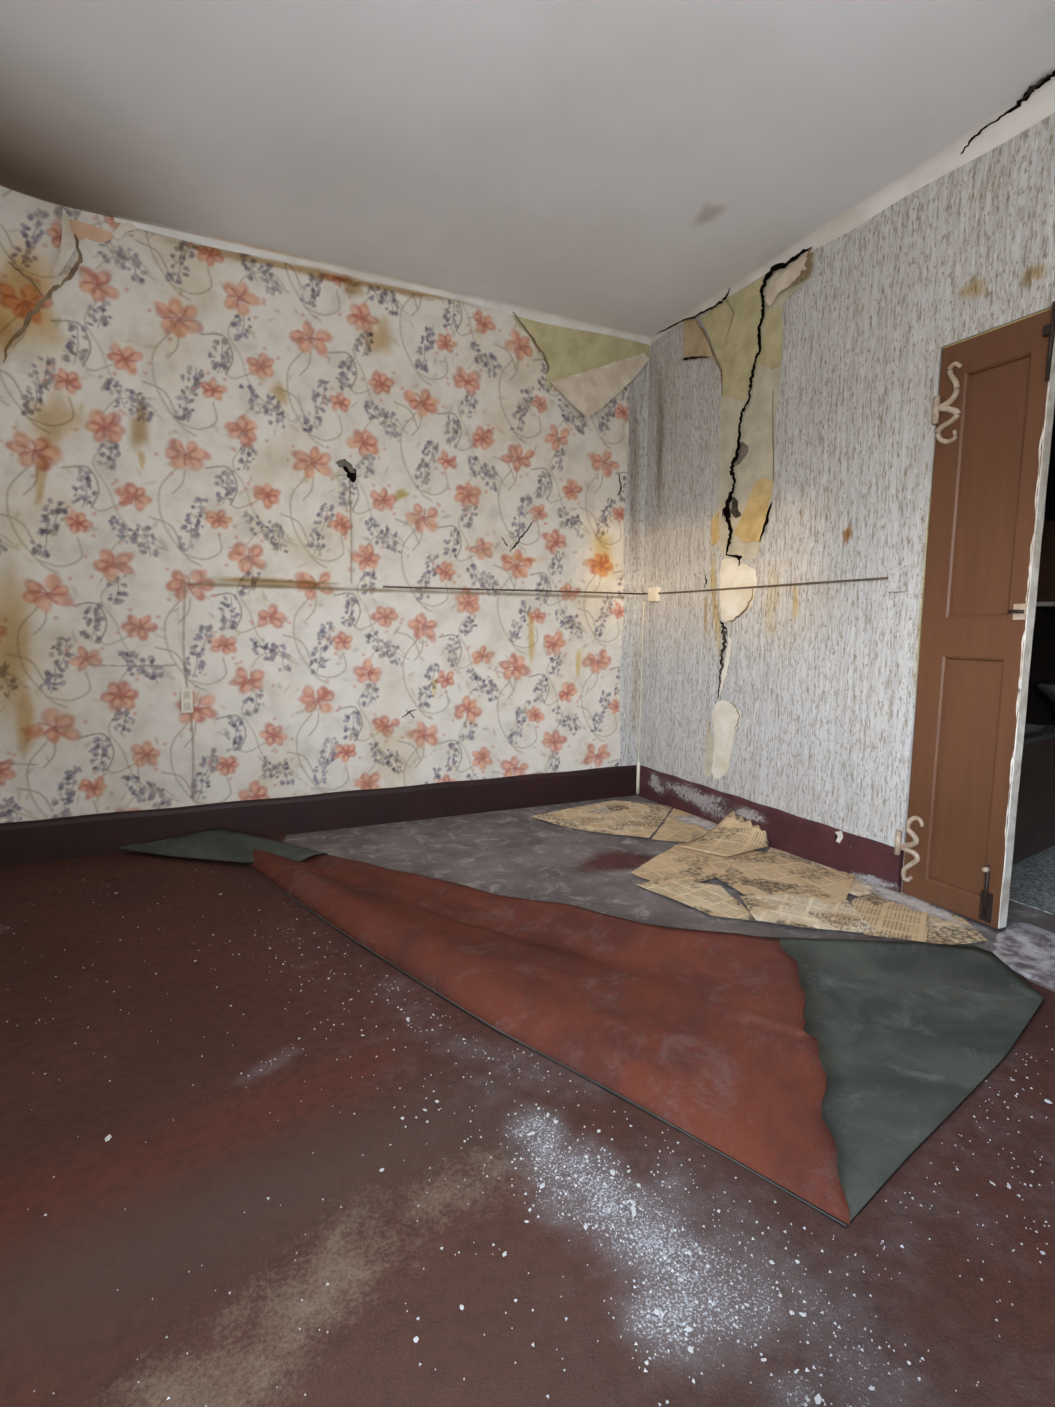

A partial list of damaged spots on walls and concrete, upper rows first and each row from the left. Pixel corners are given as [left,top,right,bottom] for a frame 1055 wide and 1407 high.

crack [961,70,1055,154]
flaking render [683,278,782,400]
crack [656,247,812,566]
flaking render [711,478,773,547]
crack [717,621,731,700]